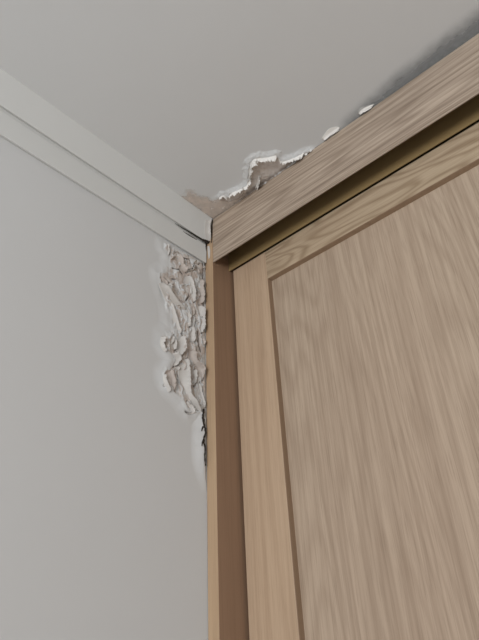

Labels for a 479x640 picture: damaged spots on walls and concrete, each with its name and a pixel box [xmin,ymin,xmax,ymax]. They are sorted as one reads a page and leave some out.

peeling [322,126,340,140]
peeling [204,145,315,241]
peeling [147,234,206,426]
crack [199,409,207,466]